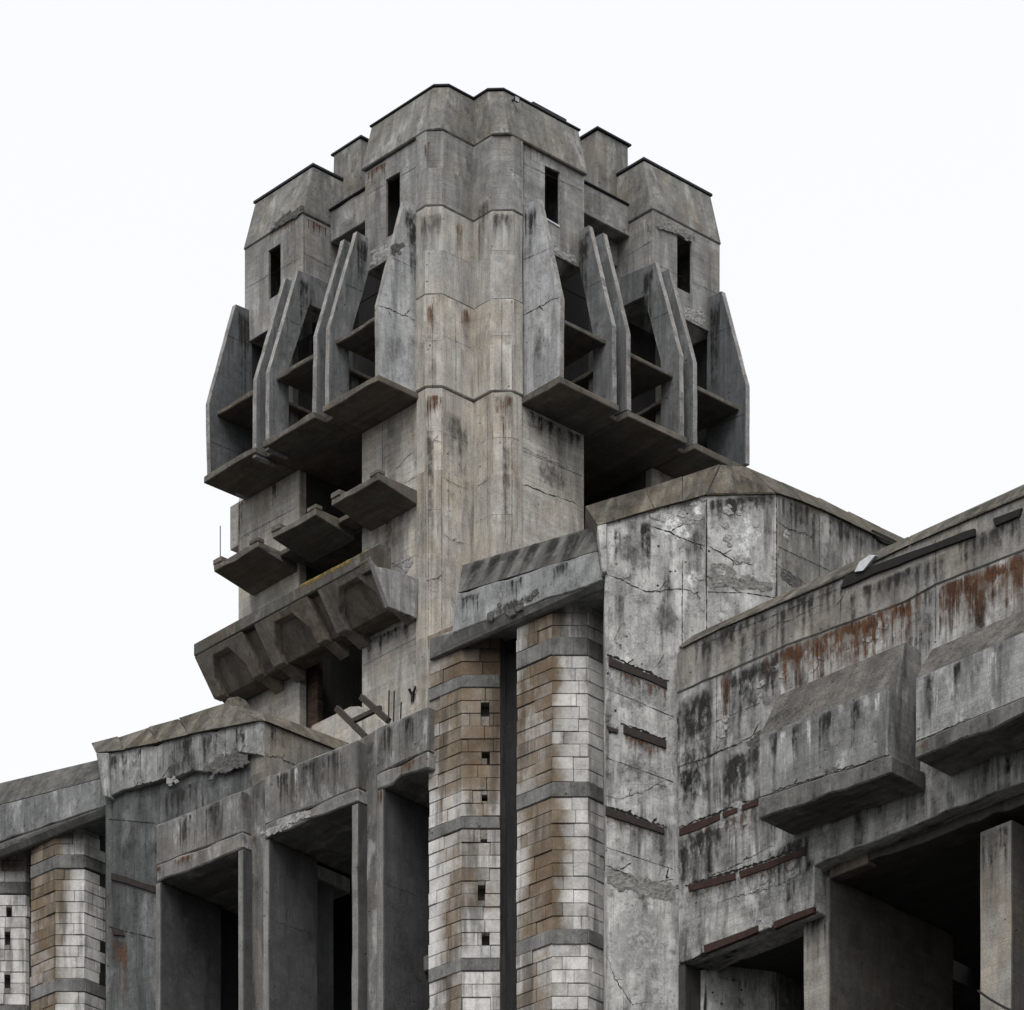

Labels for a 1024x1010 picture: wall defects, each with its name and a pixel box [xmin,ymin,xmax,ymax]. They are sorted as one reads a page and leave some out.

leakage [405,212,434,266]
crack [651,524,745,565]
spalling [487,588,539,622]
crack [610,575,700,599]
corrosion [939,555,1023,625]
corrosion [765,597,922,689]
leakage [725,656,777,717]
spalling [205,747,250,781]
leakage [677,692,712,809]
spalling [260,810,311,837]
leakage [680,747,759,880]
spalling [606,868,679,966]